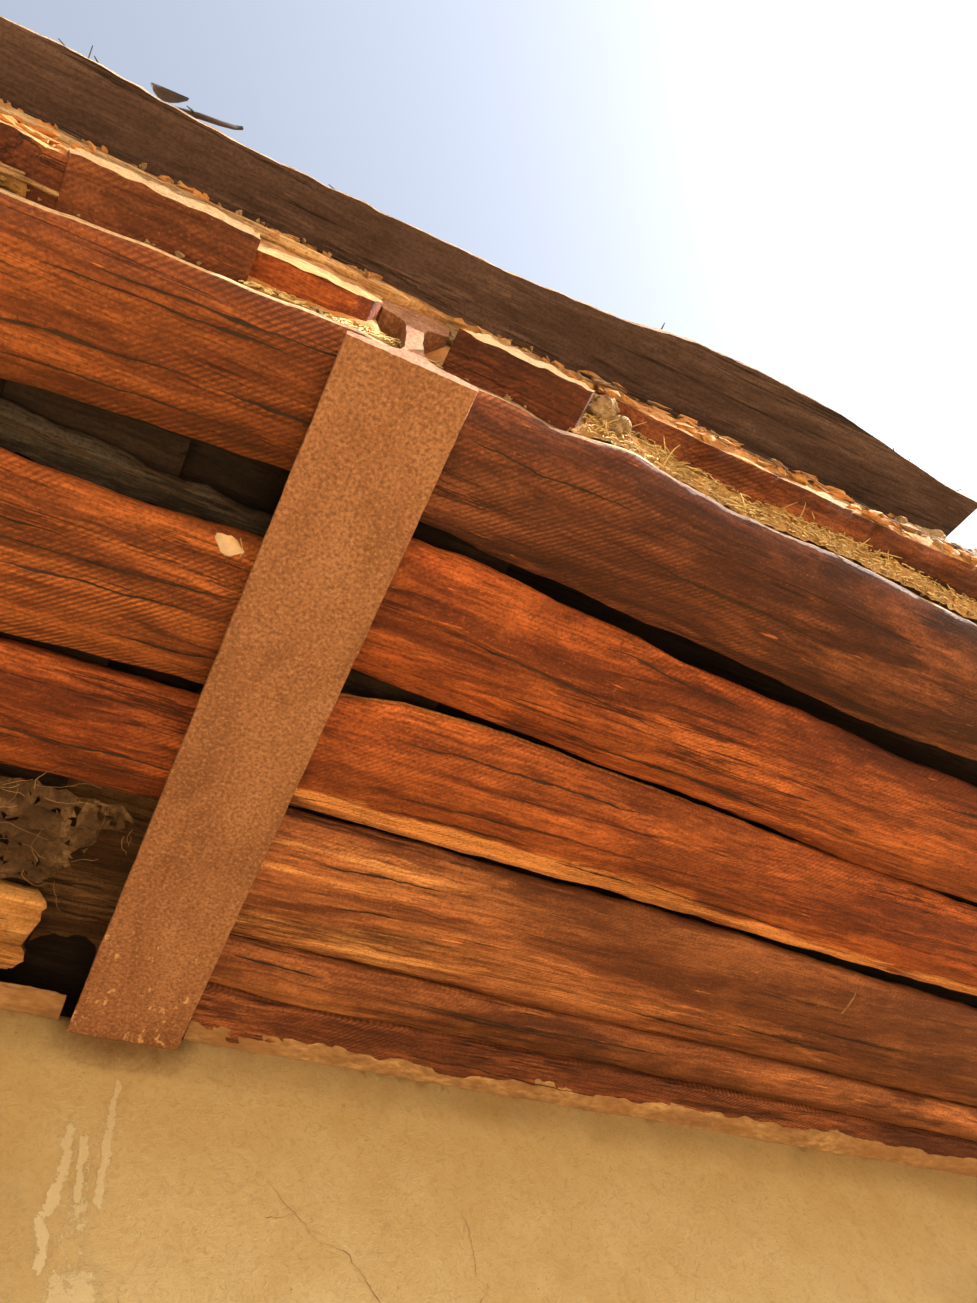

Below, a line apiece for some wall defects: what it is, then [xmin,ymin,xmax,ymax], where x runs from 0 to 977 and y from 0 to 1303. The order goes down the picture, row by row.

water stain [31,1078,122,1303]
crack [259,1169,381,1303]